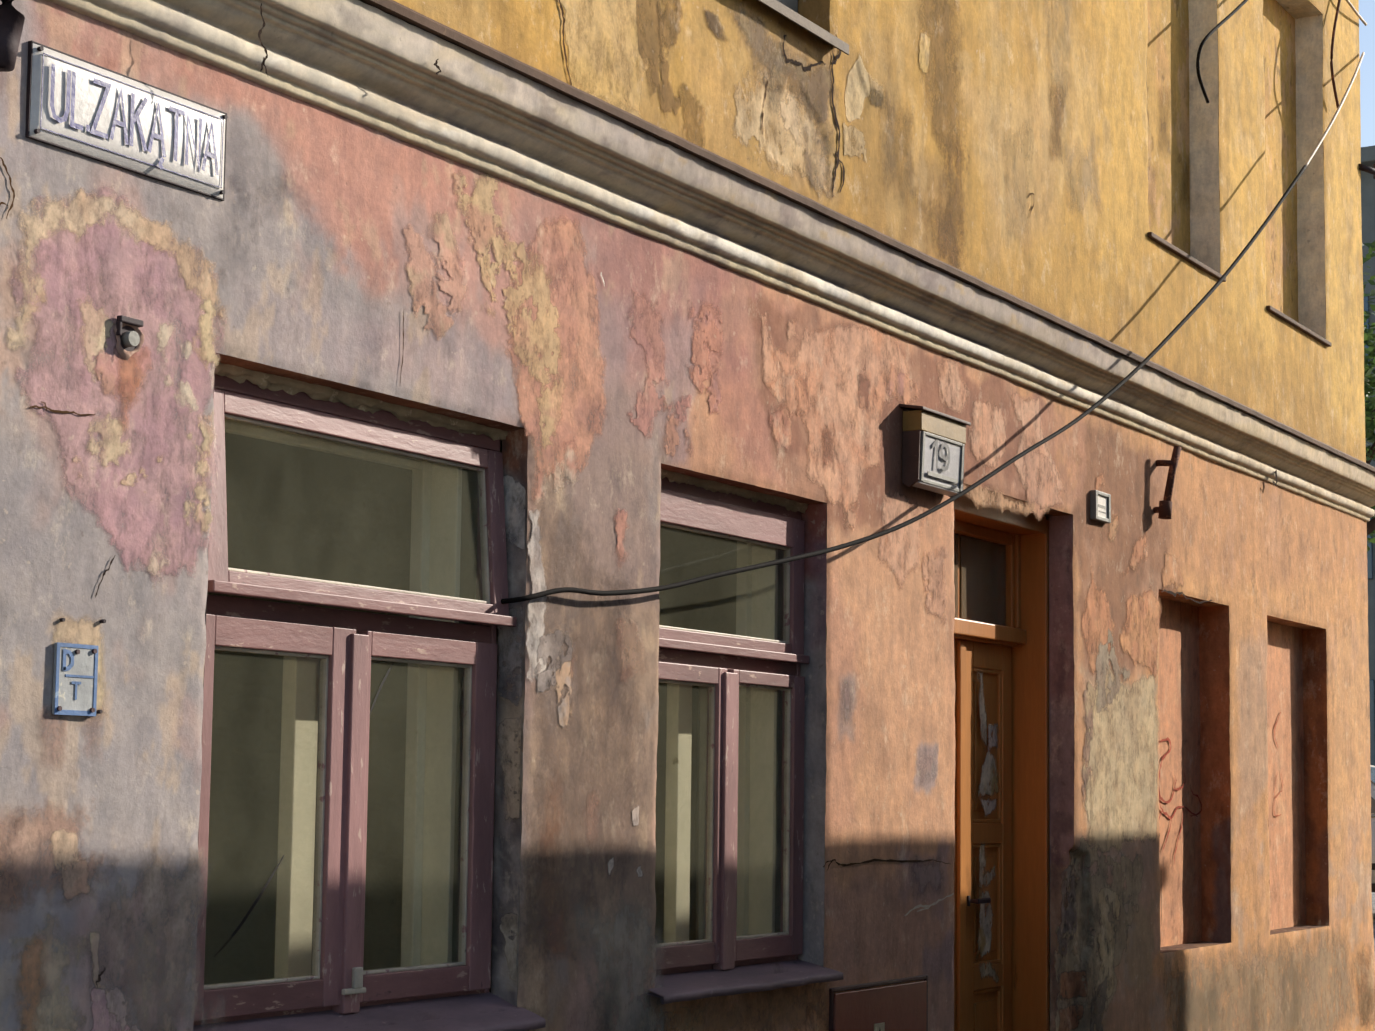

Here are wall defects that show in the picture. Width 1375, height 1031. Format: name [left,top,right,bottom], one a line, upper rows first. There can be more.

crack [0,157,15,219]
crack [258,3,268,75]
crack [559,0,572,86]
crack [761,35,845,197]
flaking render [734,11,883,197]
water stain [920,0,965,268]
crack [30,402,96,416]
peeling [8,187,225,578]
peeling [403,173,606,820]
peeling [762,317,919,529]
peeling [879,491,947,619]
flaking render [1081,553,1184,852]